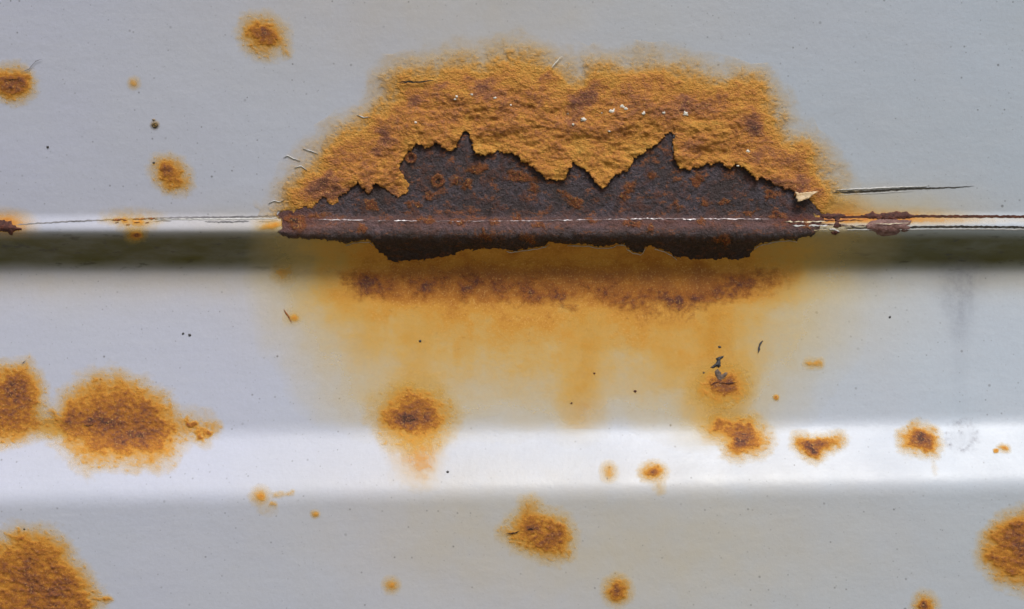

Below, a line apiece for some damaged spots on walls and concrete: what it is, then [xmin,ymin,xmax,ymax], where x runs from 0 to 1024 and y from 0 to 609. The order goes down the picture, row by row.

rust [241,16,289,58]
rust [0,59,41,103]
rust [153,157,191,193]
peeling [276,132,831,263]
rust [277,217,847,470]
rust [0,361,222,471]
rust [898,422,939,456]
rust [641,463,664,480]
rust [0,527,112,609]
rust [498,500,575,561]
rust [604,577,630,603]
rust [980,511,1024,590]